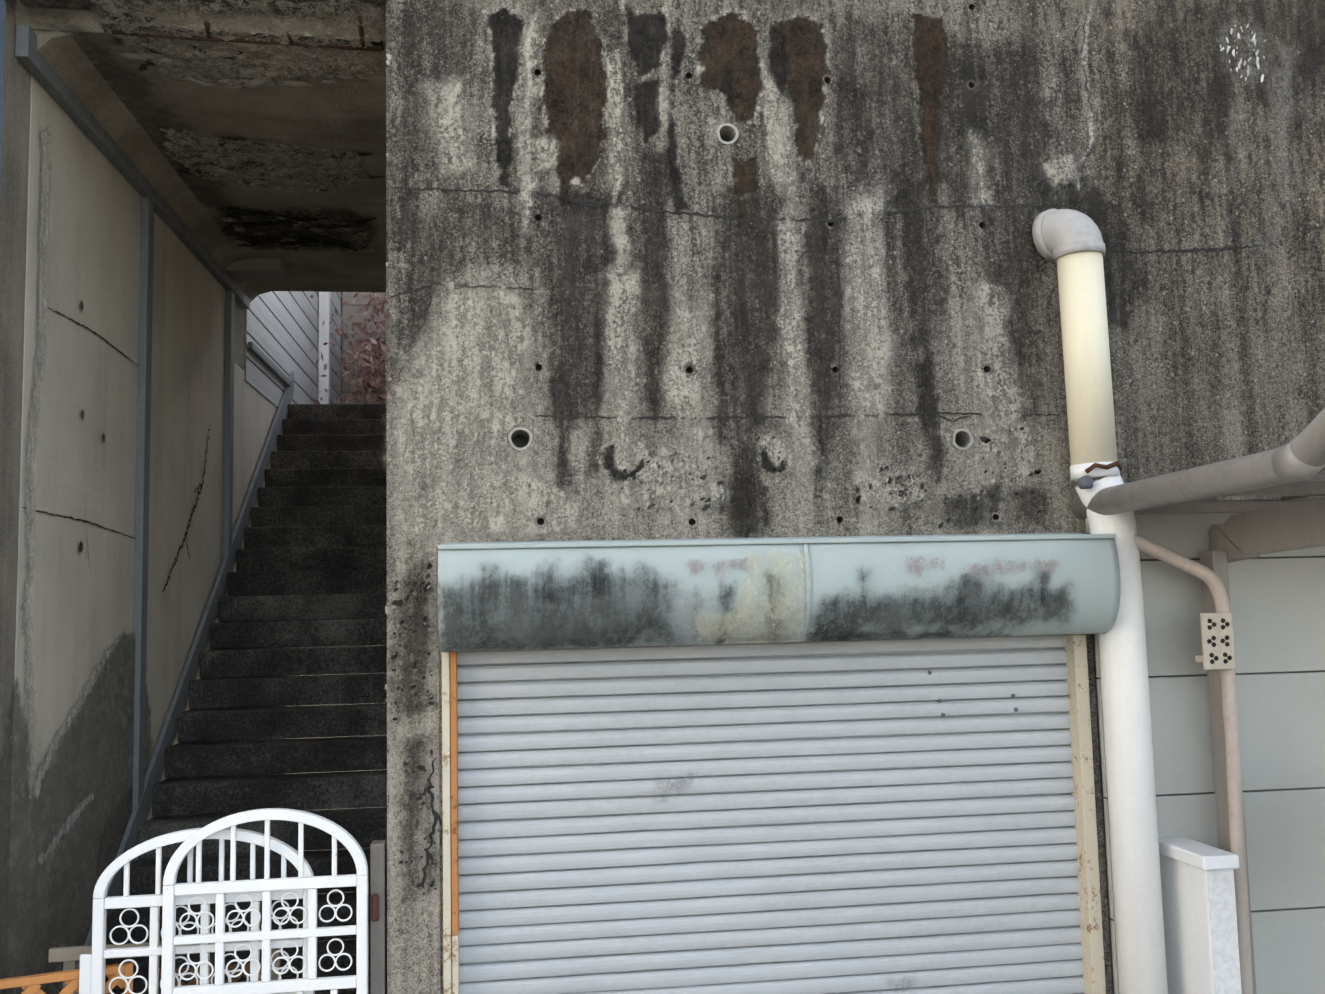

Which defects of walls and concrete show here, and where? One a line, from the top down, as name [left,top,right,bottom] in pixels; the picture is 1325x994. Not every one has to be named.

leakage [82,0,383,45]
rust [482,3,527,187]
rust [539,8,609,206]
rust [619,0,831,218]
rust [912,14,949,204]
leakage [1123,0,1325,222]
leakage [390,0,1143,540]
crack [162,425,210,592]
crack [418,758,443,888]